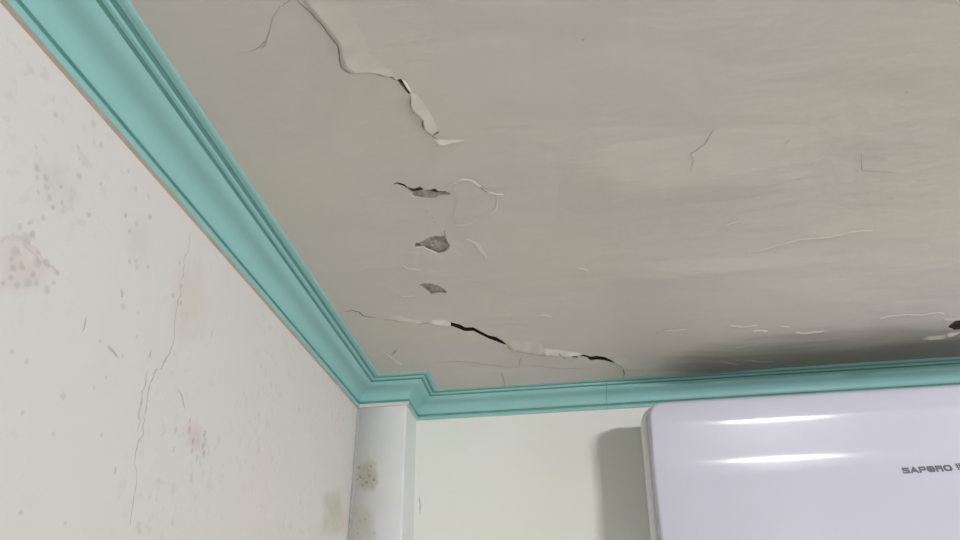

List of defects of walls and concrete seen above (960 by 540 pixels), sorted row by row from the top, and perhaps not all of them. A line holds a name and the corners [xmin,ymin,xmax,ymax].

crack [249,0,464,146]
spalling [395,183,451,198]
spalling [415,231,450,254]
spalling [418,283,447,294]
peeling [880,312,960,340]
crack [346,310,647,408]
crack [130,236,190,526]